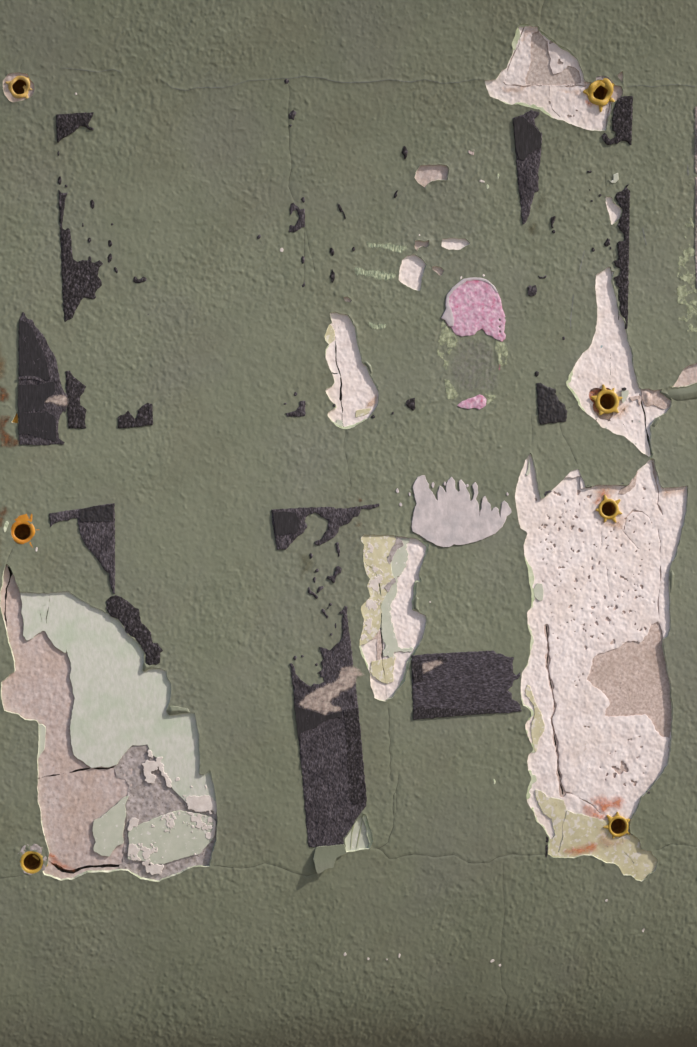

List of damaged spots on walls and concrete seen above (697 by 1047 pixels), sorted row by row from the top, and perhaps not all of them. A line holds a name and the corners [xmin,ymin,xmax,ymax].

peeling [485,24,623,131]
peeling [325,297,379,429]
peeling [359,535,429,701]
peeling [515,267,697,881]
peeling [0,565,217,880]
peeling [345,814,372,851]